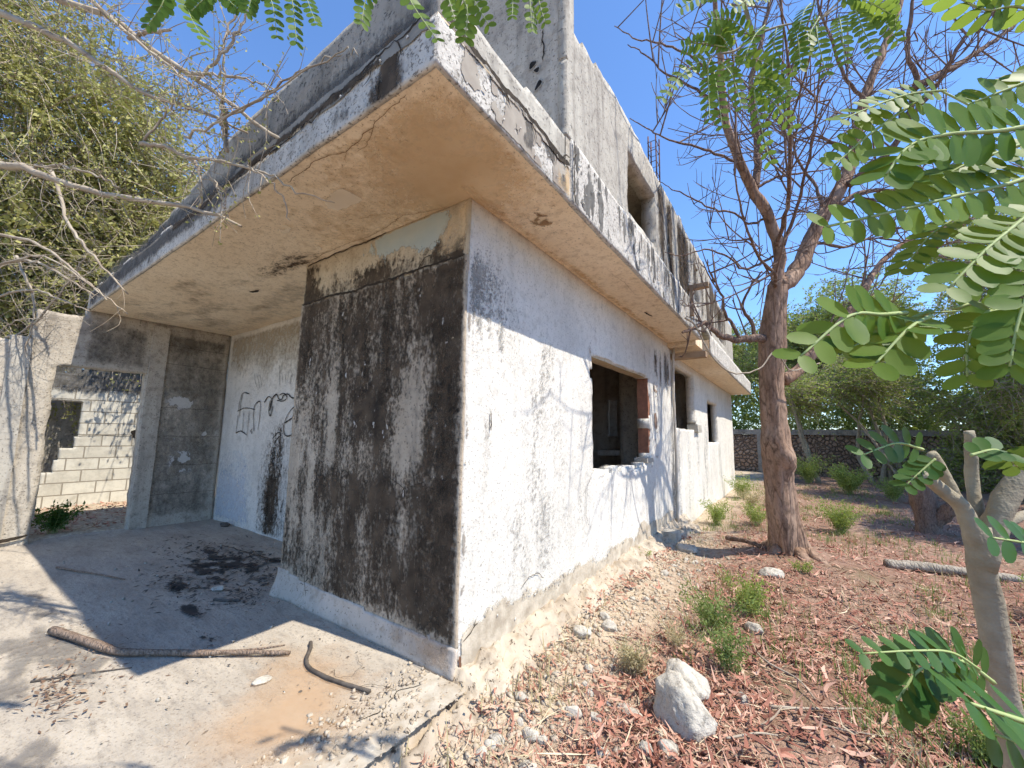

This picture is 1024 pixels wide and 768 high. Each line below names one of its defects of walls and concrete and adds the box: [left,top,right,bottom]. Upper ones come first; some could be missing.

crack [302,207,464,306]
peeling [363,210,452,259]
peeling [461,41,697,326]
water stain [52,326,145,394]
water stain [150,231,515,644]
water stain [510,344,561,576]
flaking render [461,510,673,667]